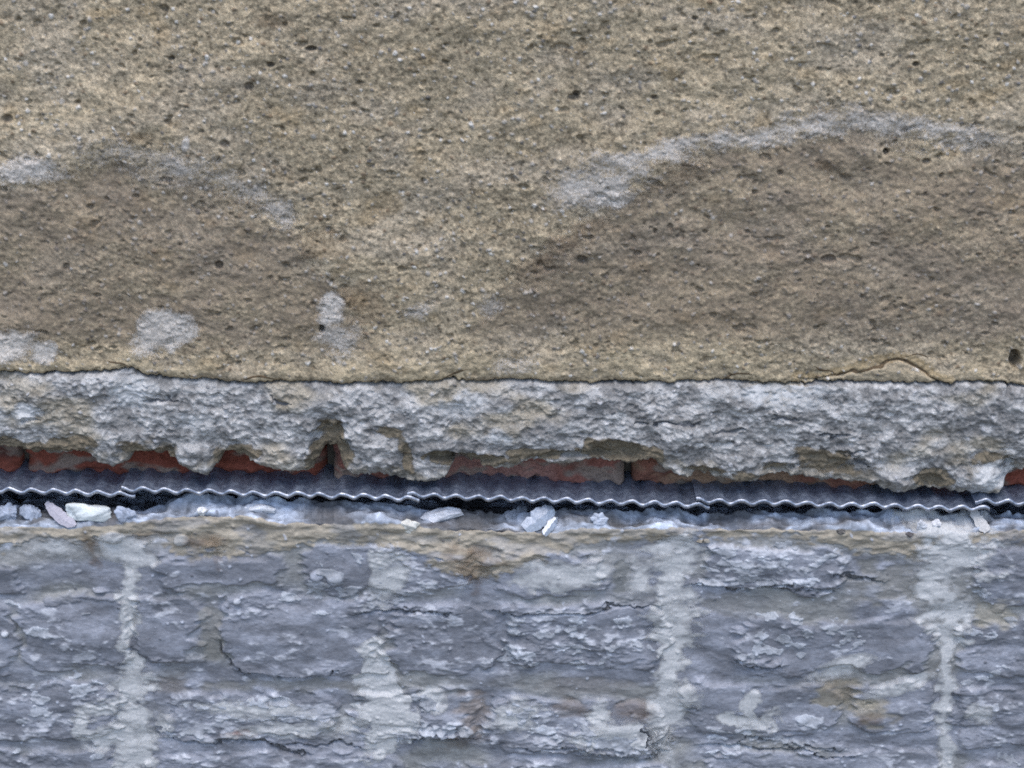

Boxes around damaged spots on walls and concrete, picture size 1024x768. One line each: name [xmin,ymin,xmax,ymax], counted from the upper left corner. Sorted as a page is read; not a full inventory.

leakage [554,103,995,213]
crack [803,353,940,381]
flaking render [0,435,190,474]
spalling [213,418,389,479]
flaking render [376,426,877,489]
spalling [914,467,955,488]
spalling [971,450,1024,486]
leakage [509,555,613,594]
leakage [25,534,174,768]
leakage [569,530,709,768]
leakage [866,508,1013,768]
leakage [198,637,448,765]